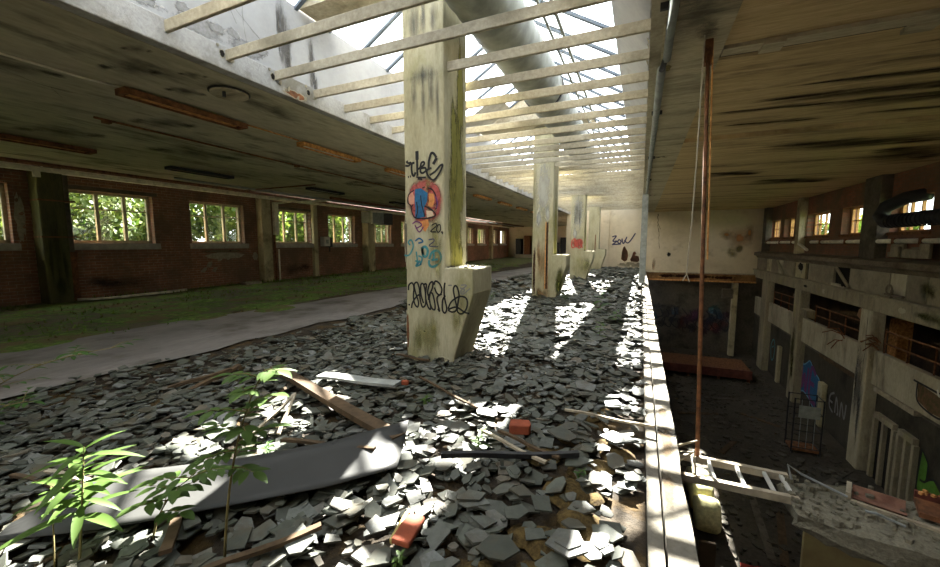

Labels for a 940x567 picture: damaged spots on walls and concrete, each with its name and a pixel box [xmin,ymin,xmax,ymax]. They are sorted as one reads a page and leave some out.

water stain [276,9,286,33]
water stain [281,44,291,68]
water stain [724,67,940,126]
water stain [451,41,464,196]
water stain [780,133,940,160]
water stain [711,172,823,184]